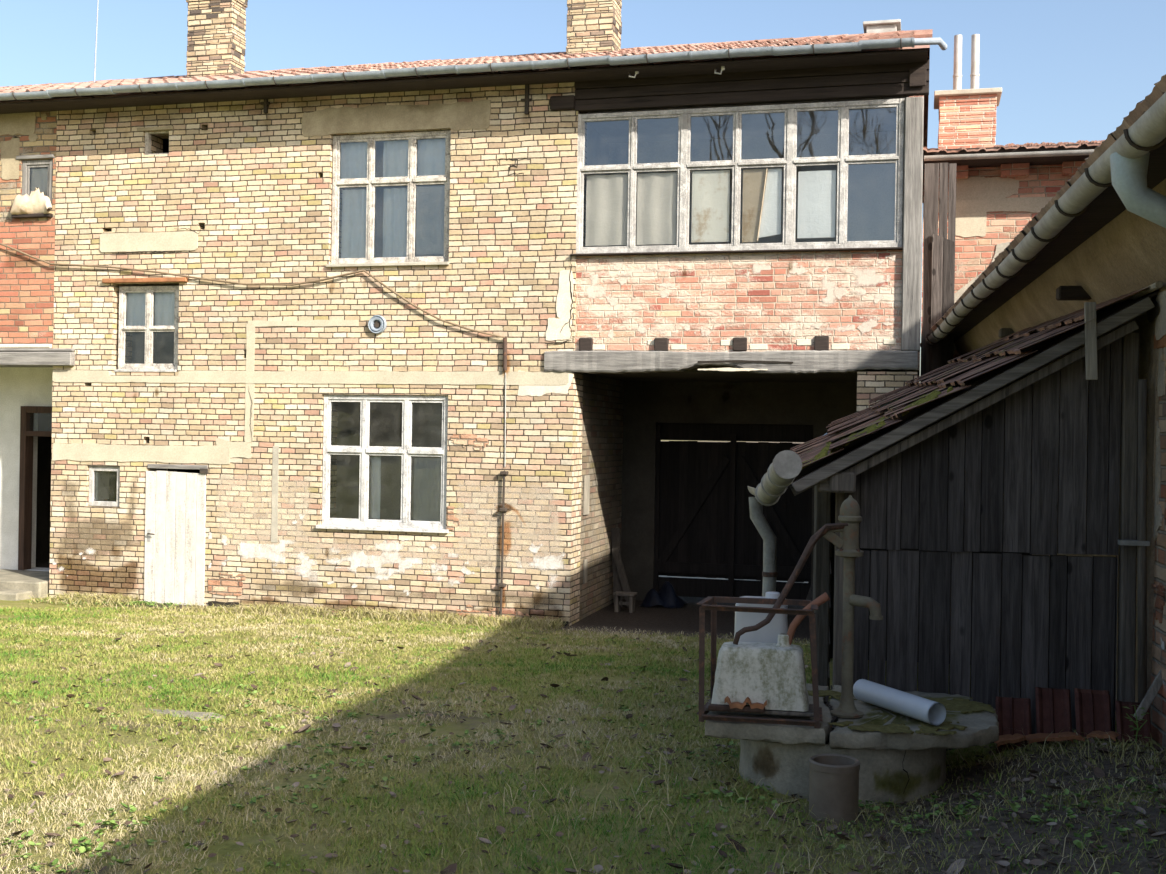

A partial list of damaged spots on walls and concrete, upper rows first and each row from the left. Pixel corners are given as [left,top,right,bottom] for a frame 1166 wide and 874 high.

peeling [581,263,678,312]
peeling [746,264,771,282]
peeling [784,262,808,277]
peeling [822,255,897,304]
peeling [812,316,896,334]